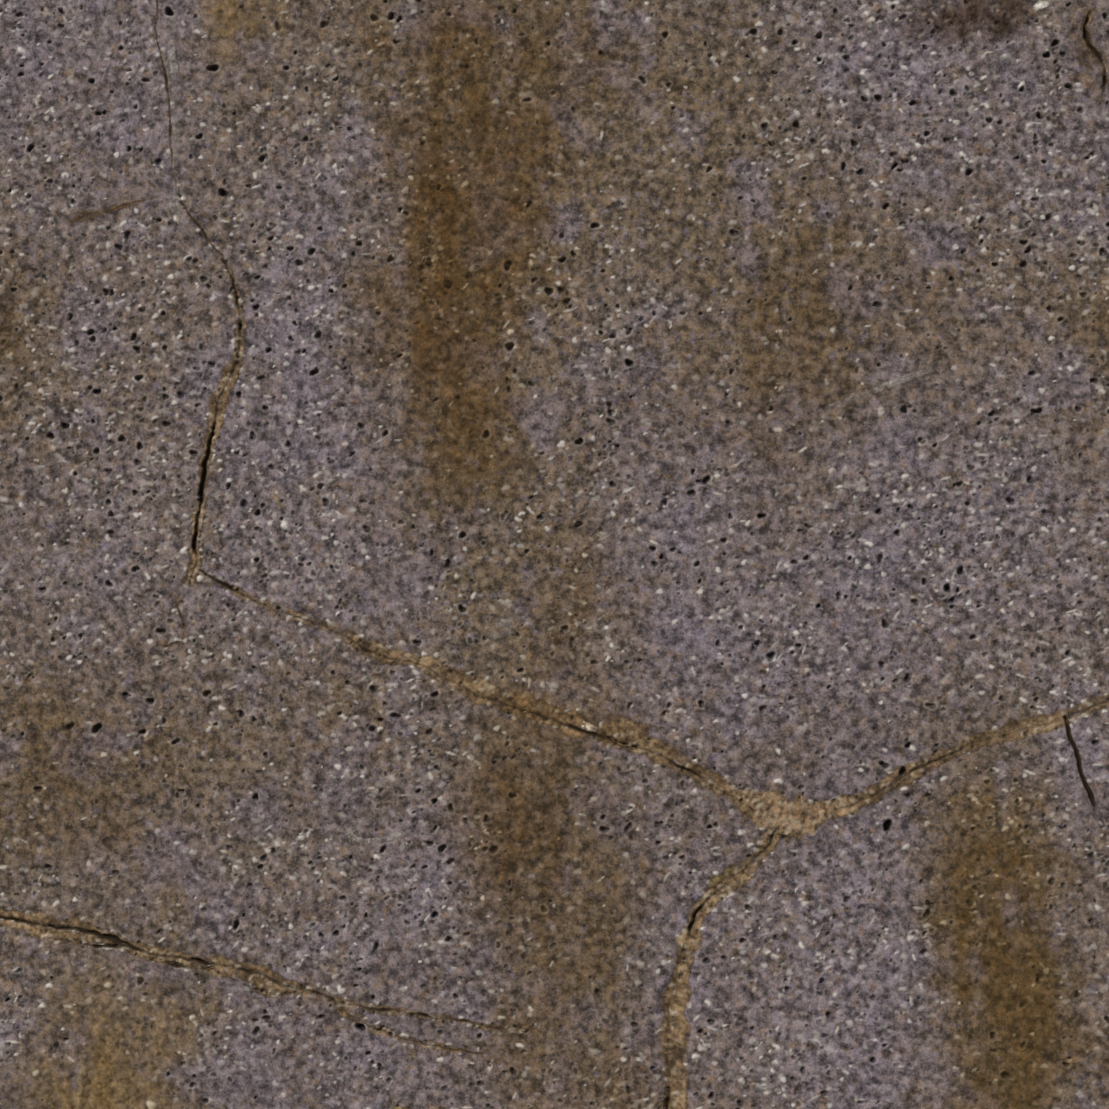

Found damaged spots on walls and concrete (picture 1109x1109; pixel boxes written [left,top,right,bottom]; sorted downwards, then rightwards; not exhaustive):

crack [1076,9,1108,91]
crack [154,0,279,615]
crack [164,599,186,647]
crack [287,608,1109,1109]
crack [0,907,533,1054]